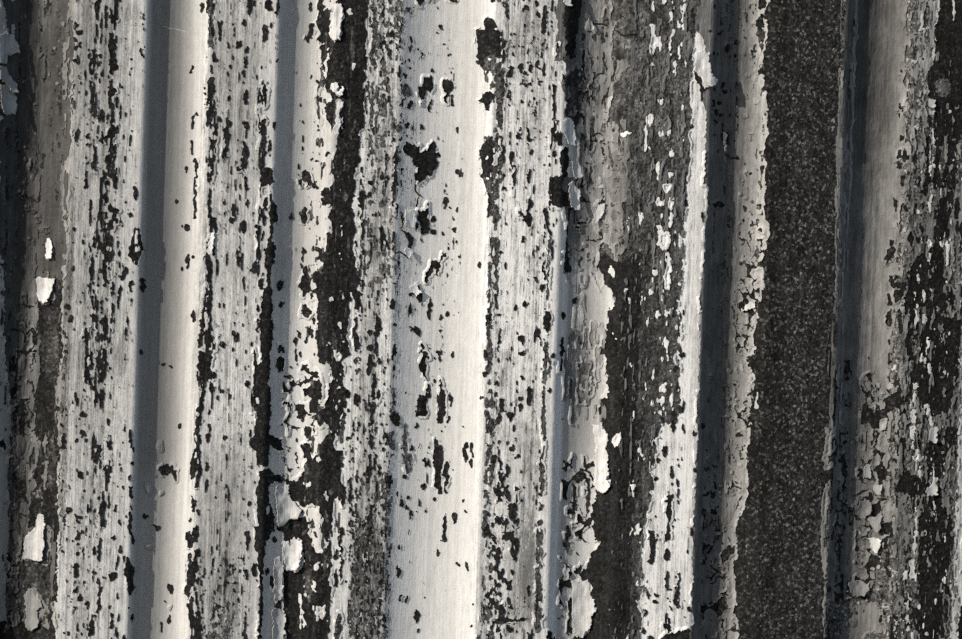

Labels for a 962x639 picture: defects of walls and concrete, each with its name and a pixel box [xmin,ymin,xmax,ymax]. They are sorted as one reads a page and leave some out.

peeling [322,4,344,51]
peeling [332,82,344,135]
peeling [0,0,75,631]
peeling [395,209,417,228]
peeling [550,0,669,493]
peeling [658,175,674,210]
peeling [681,0,770,639]
peeling [823,0,962,639]
peeling [264,483,302,639]
peeling [571,570,596,638]